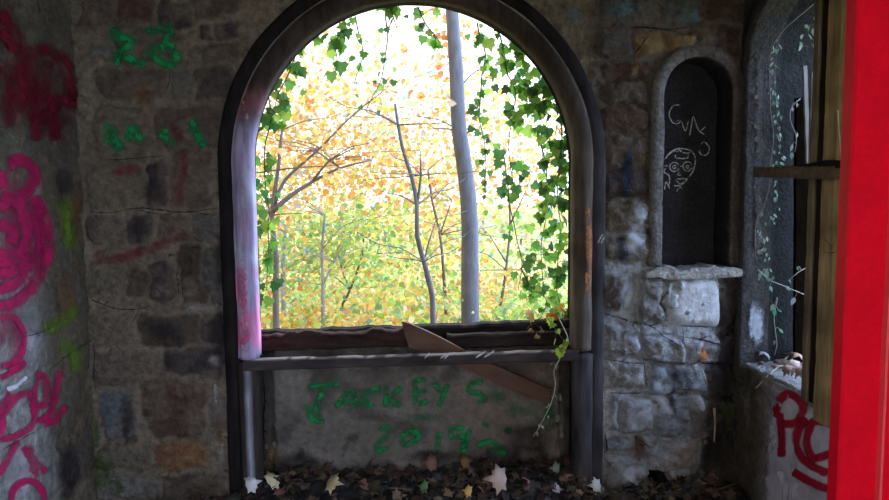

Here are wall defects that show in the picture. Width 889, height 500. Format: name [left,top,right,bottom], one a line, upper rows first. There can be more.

crack [605,292,734,395]